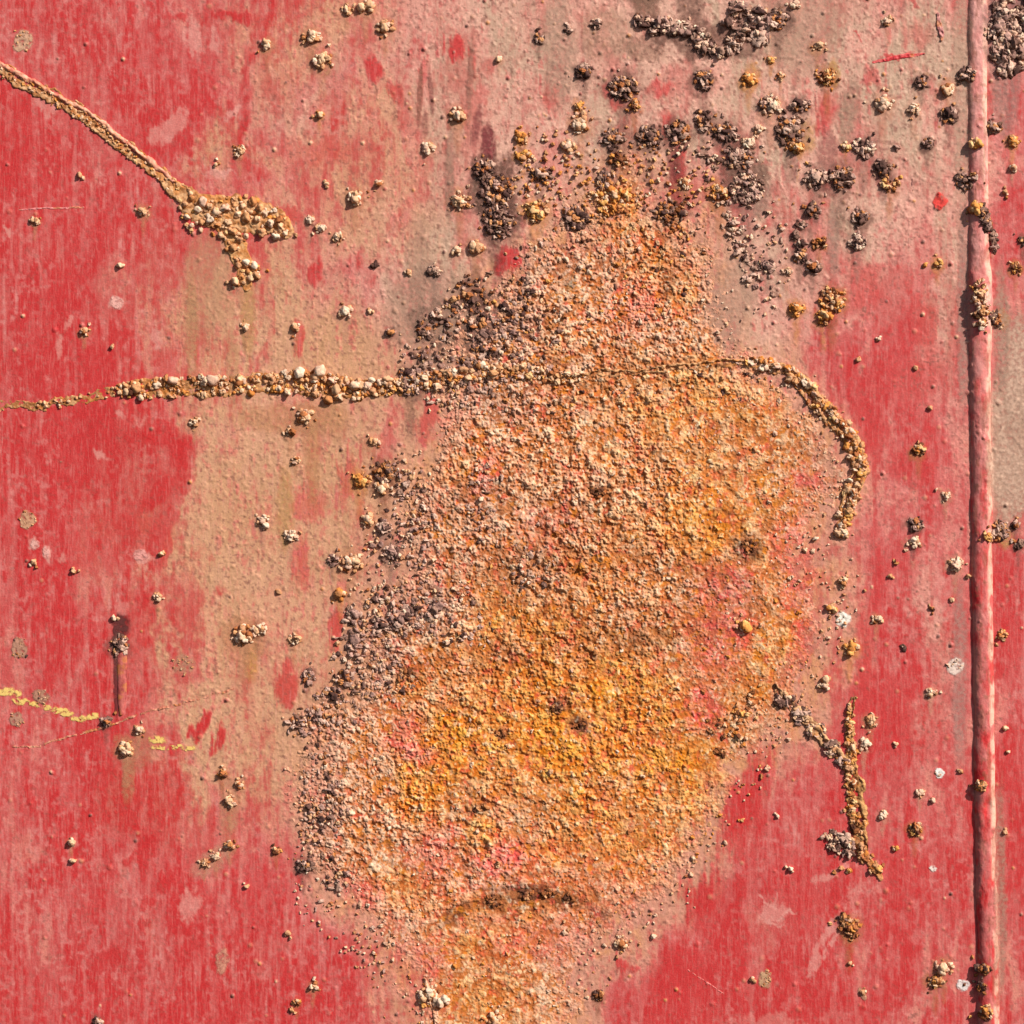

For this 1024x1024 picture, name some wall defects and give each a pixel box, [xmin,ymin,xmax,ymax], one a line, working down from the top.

peeling [13,30,33,52]
rust [983,0,1024,80]
rust [906,65,977,124]
rust [953,167,1000,255]
rust [969,278,1010,334]
peeling [18,510,37,529]
rust [271,0,903,1024]
peeling [11,637,28,658]
rust [99,614,130,728]
peeling [10,712,24,727]
peeling [216,948,230,974]
peeling [759,969,771,988]